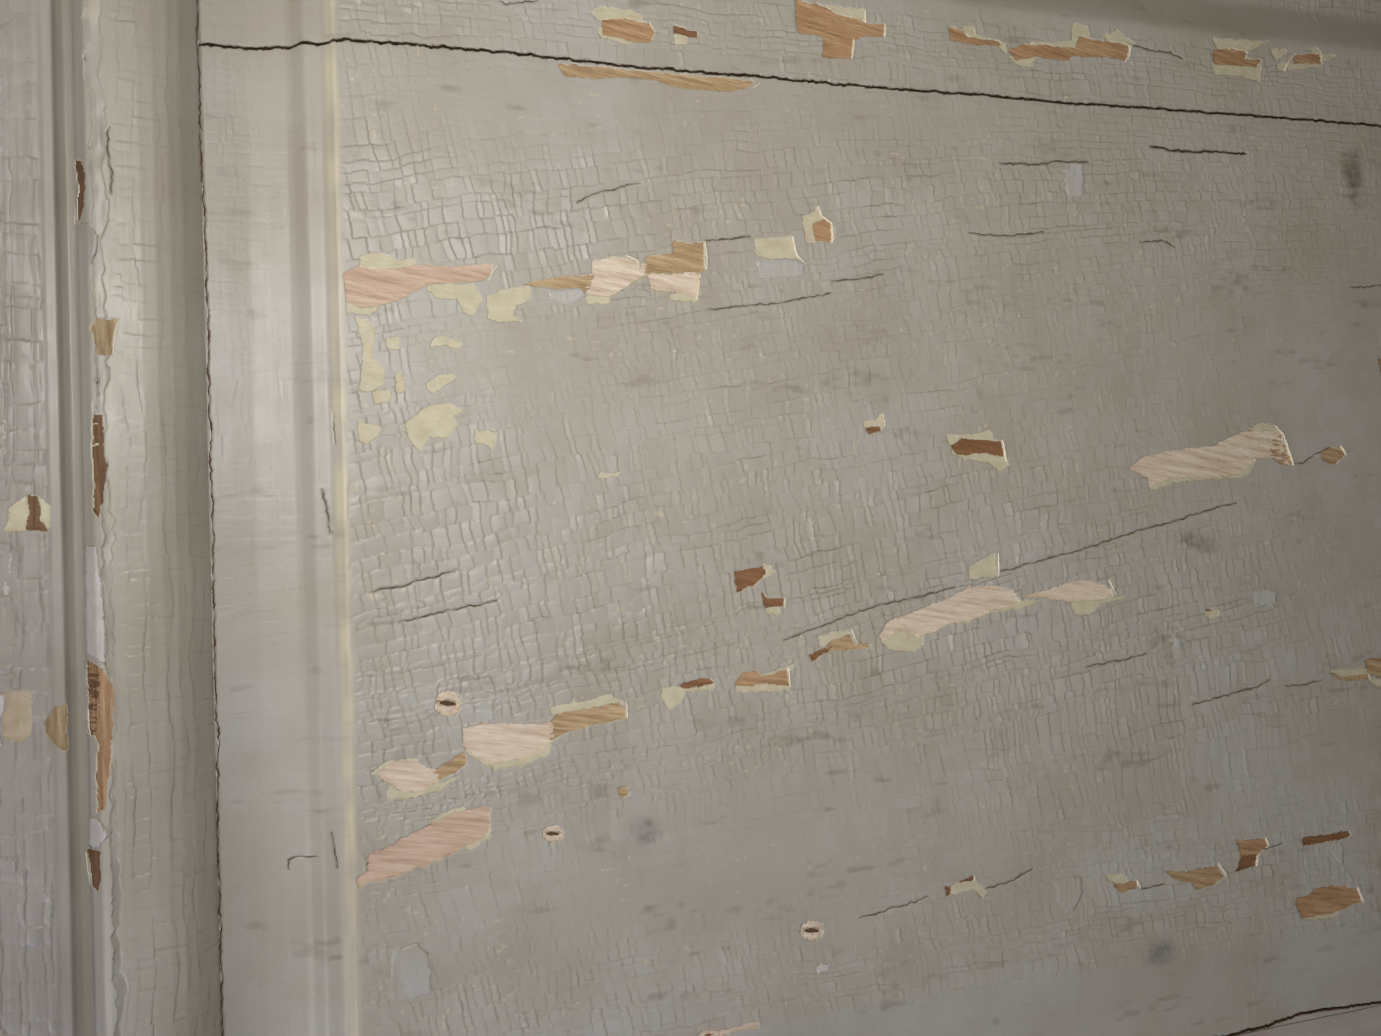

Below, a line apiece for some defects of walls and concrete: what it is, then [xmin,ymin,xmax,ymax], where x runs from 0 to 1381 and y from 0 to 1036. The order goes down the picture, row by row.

crack [196,0,1381,127]
peeling [795,0,886,59]
crack [1151,146,1246,155]
peeling [343,240,708,404]
crack [714,274,880,310]
peeling [1128,423,1295,490]
crack [198,62,224,1036]
crack [1001,502,1237,571]
peeling [809,553,1124,661]
peeling [84,545,114,891]
peeling [371,694,629,800]
crack [1222,1001,1381,1036]